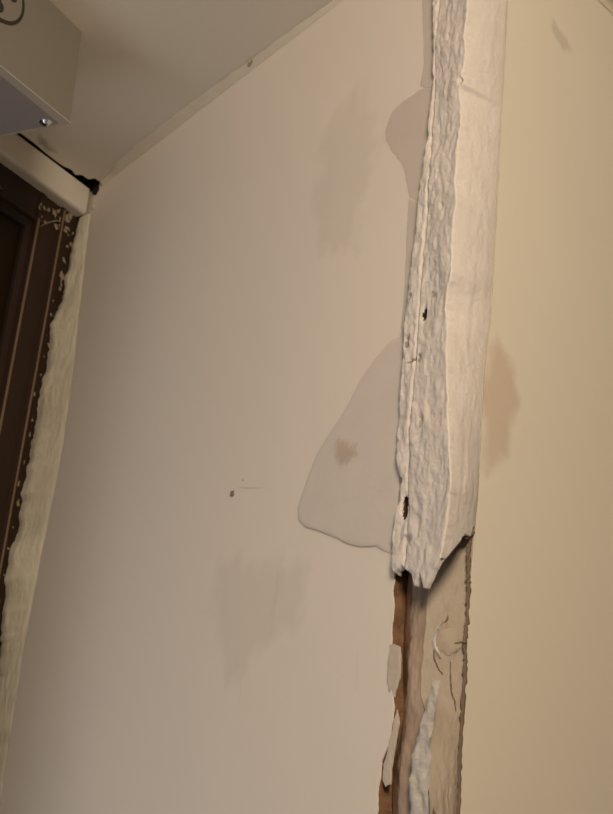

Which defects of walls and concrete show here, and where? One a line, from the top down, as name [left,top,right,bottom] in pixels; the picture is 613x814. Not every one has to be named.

spalling [378,534,474,814]